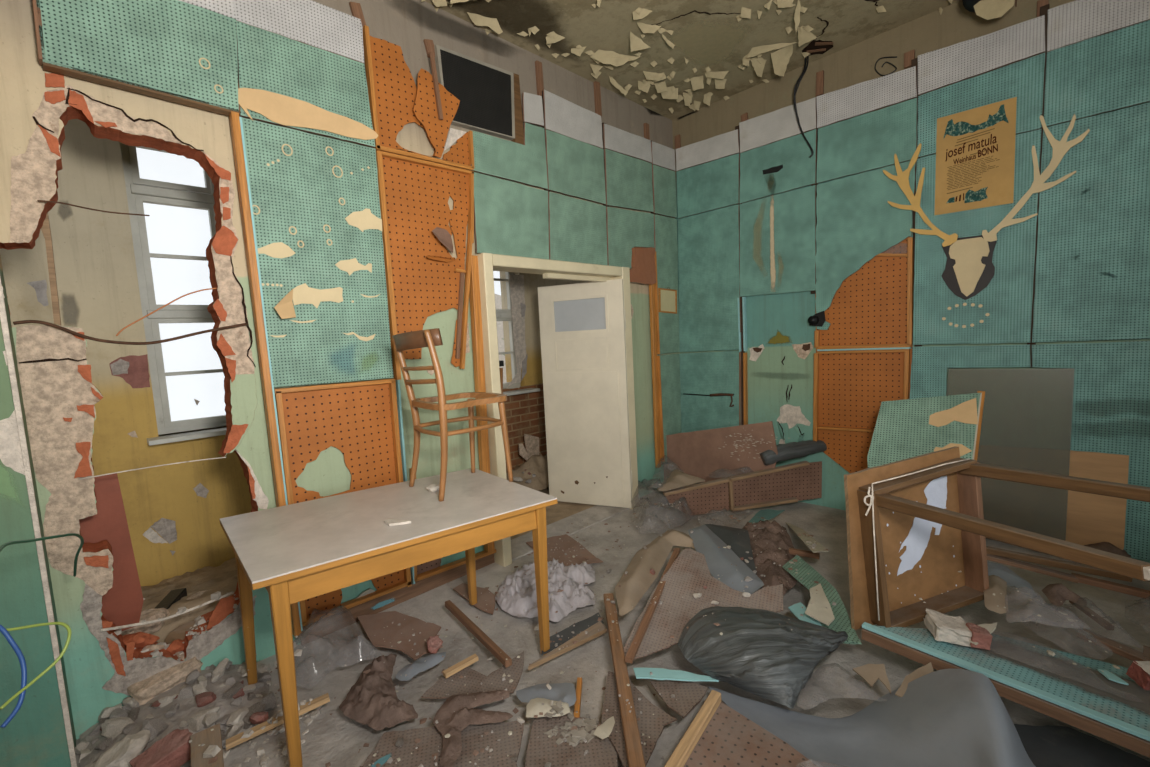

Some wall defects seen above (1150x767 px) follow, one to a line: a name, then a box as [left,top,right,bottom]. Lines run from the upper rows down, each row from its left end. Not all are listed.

peeling [421,0,833,113]
spalling [9,73,183,243]
crack [19,356,86,364]
spalling [203,151,269,509]
crack [230,256,256,367]
spalling [0,325,256,696]